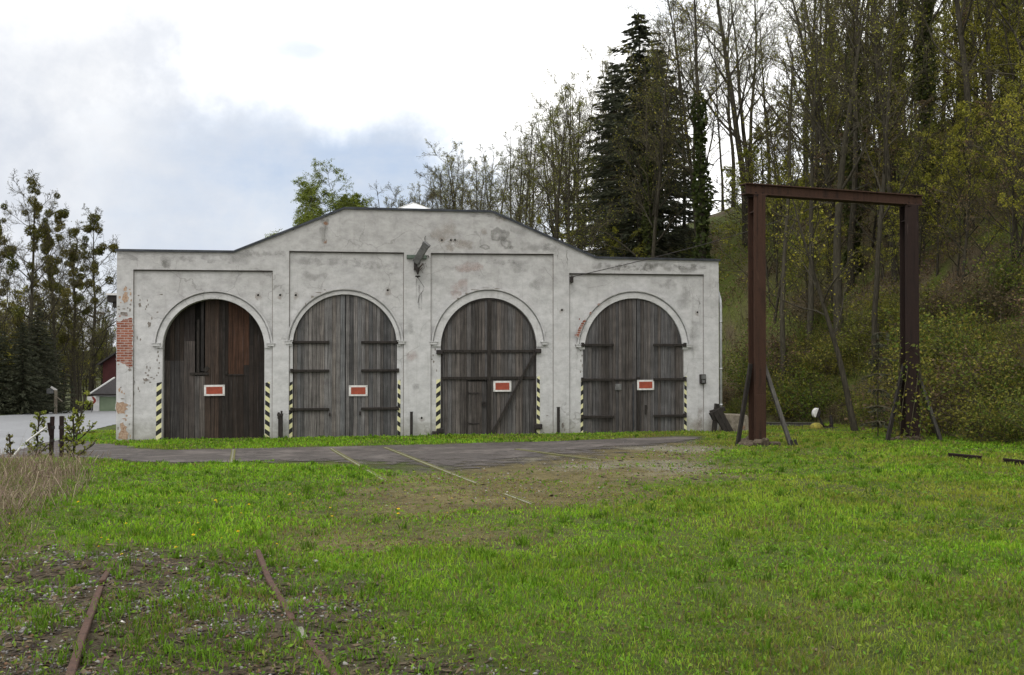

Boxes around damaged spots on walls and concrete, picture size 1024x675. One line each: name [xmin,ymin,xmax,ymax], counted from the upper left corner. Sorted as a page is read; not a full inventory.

flaking render [116,286,158,371]
flaking render [115,387,131,440]